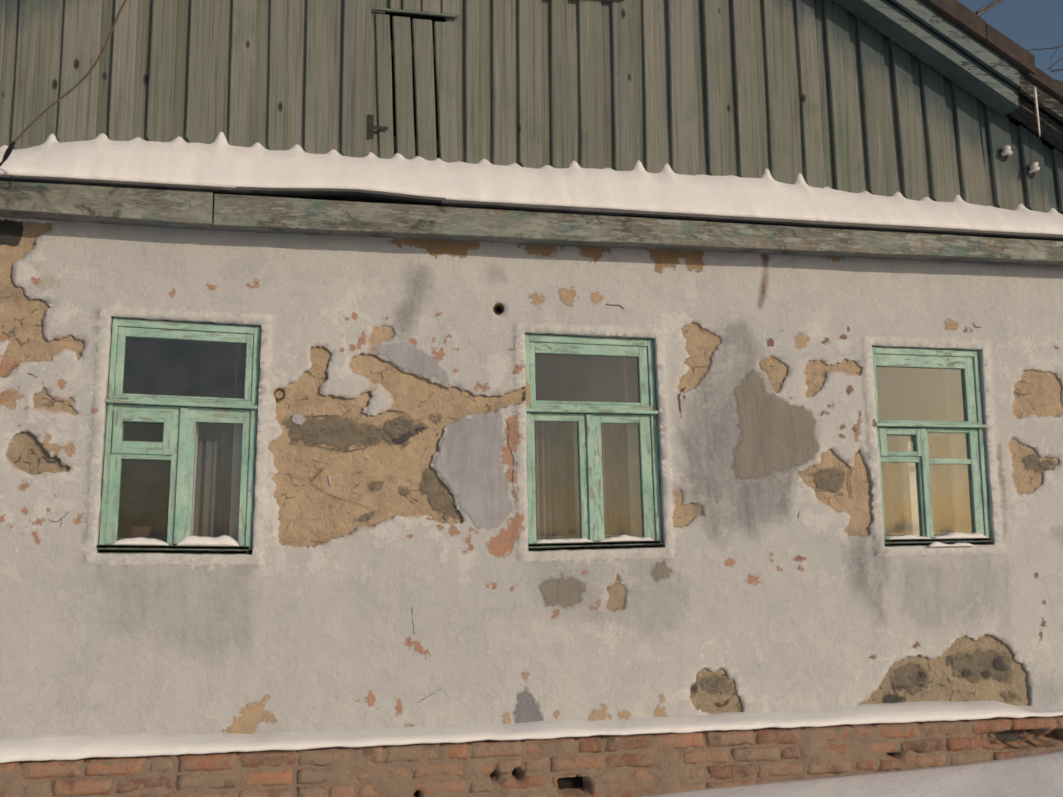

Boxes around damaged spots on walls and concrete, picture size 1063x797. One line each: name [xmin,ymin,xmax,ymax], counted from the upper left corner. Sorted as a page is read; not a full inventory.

peeling [0,219,85,415]
peeling [678,323,721,393]
peeling [1013,370,1063,419]
spalling [6,424,76,492]
peeling [268,317,531,558]
peeling [797,411,877,536]
peeling [1008,438,1059,494]
peeling [0,507,51,545]
peeling [221,694,277,734]
spalling [689,668,742,714]
spalling [861,634,1030,706]